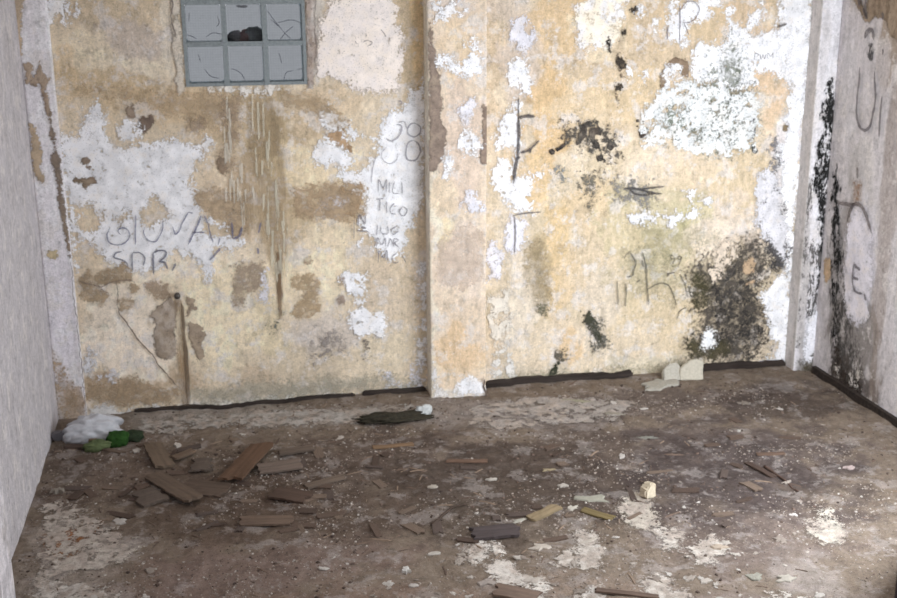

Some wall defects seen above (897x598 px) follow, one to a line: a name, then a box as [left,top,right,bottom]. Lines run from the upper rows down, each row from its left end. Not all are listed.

peeling [15,0,247,285]
peeling [308,0,545,398]
spalling [549,121,615,162]
peeling [571,0,813,361]
damp [641,34,760,159]
damp [678,77,862,395]